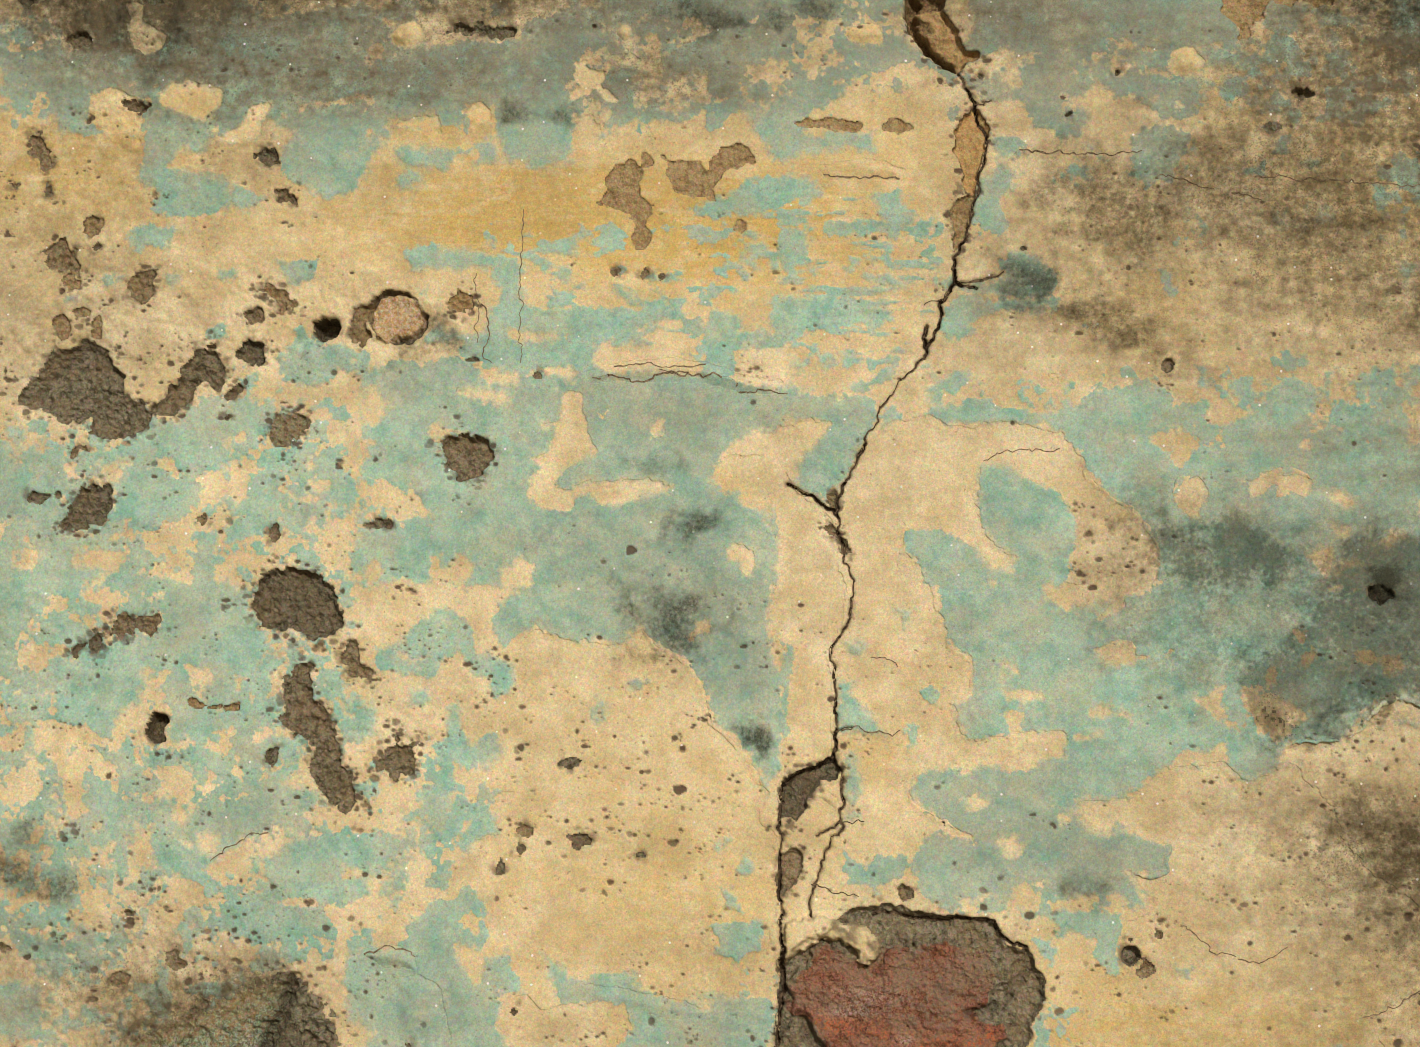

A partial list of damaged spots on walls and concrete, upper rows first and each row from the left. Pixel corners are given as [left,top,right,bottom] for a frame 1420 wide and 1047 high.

peeling [596,143,756,250]
spalling [18,215,298,459]
spalling [440,433,495,482]
crack [774,74,1420,1047]
spalling [251,566,373,679]
spalling [264,747,279,768]
spalling [278,662,357,815]
peeling [468,415,1161,1047]
leakage [1256,693,1299,738]
peeling [1066,693,1420,1047]
spalling [164,945,188,971]
spalling [130,971,342,1047]